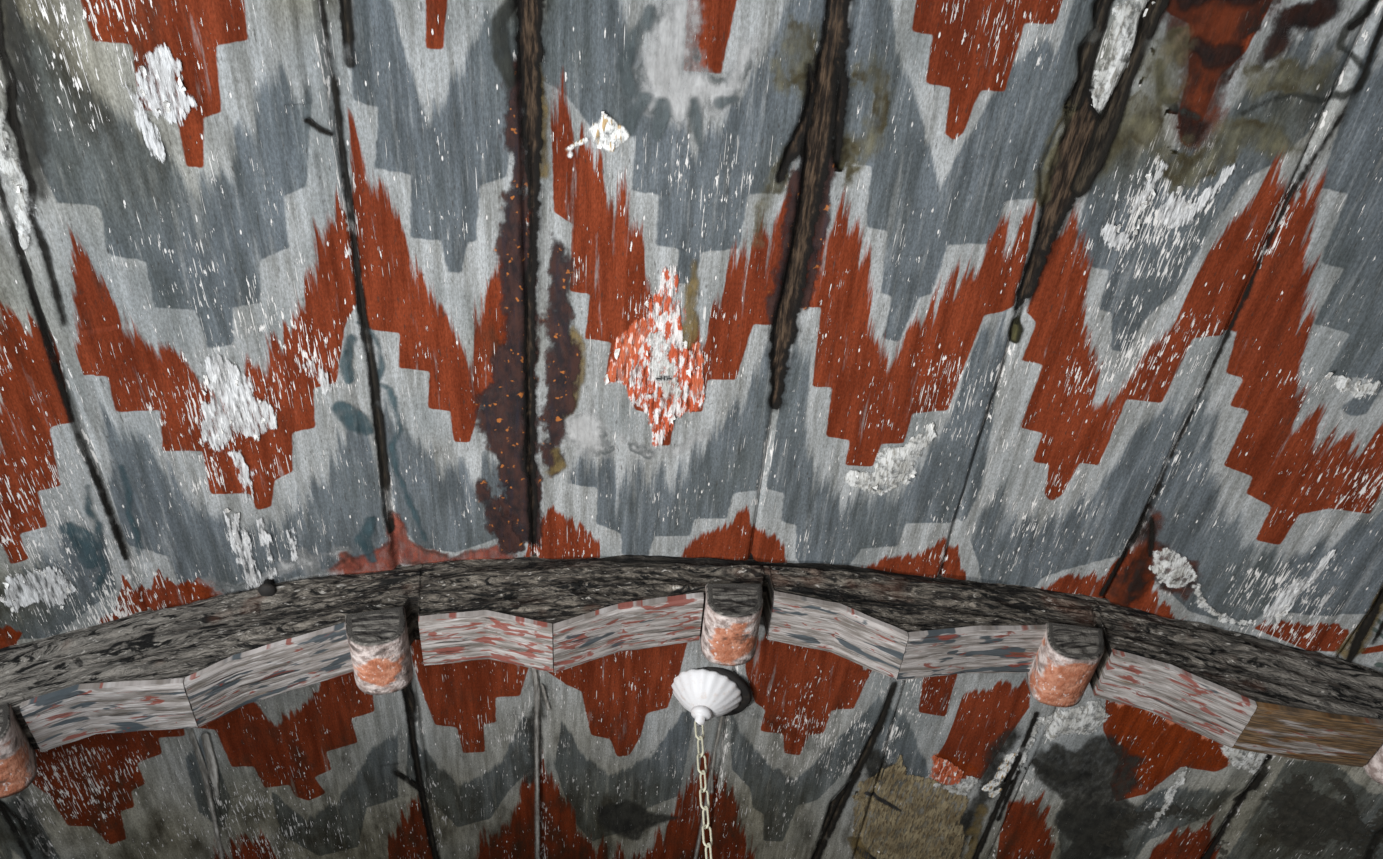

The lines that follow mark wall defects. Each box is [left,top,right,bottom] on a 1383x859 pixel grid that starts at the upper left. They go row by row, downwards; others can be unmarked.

peeling [123,43,197,163]
peeling [567,111,629,157]
damp [1111,0,1378,190]
peeling [1100,157,1235,249]
peeling [605,265,705,447]
peeling [844,422,936,496]
peeling [1149,548,1336,626]